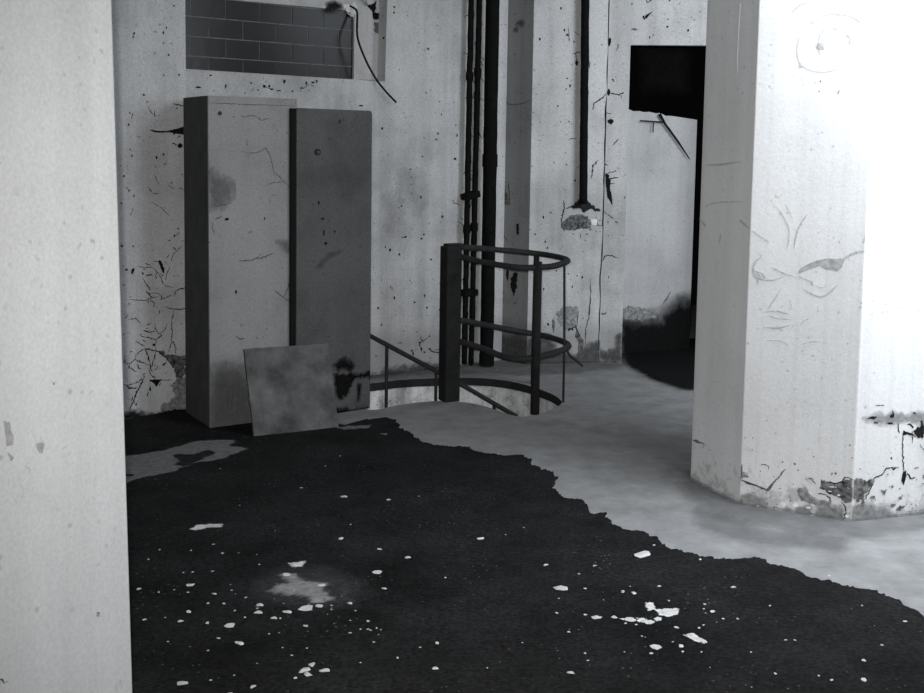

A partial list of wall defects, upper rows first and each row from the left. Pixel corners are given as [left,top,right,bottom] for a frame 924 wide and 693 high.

spalling [543,202,603,239]
crack [124,287,185,408]
spalling [147,344,186,411]
spalling [740,420,924,520]
crack [874,423,924,479]